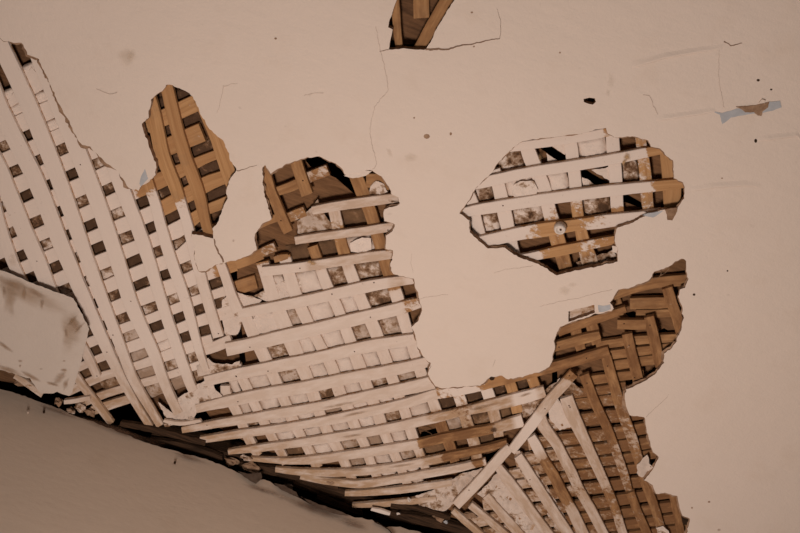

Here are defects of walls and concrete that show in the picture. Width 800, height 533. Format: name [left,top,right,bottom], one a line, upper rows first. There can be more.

crack [426,14,501,51]
flaking render [0,38,130,189]
peeling [715,99,781,124]
flaking render [603,128,685,220]
flaking render [236,156,391,261]
flaking render [594,259,681,314]
flaking render [413,331,498,390]